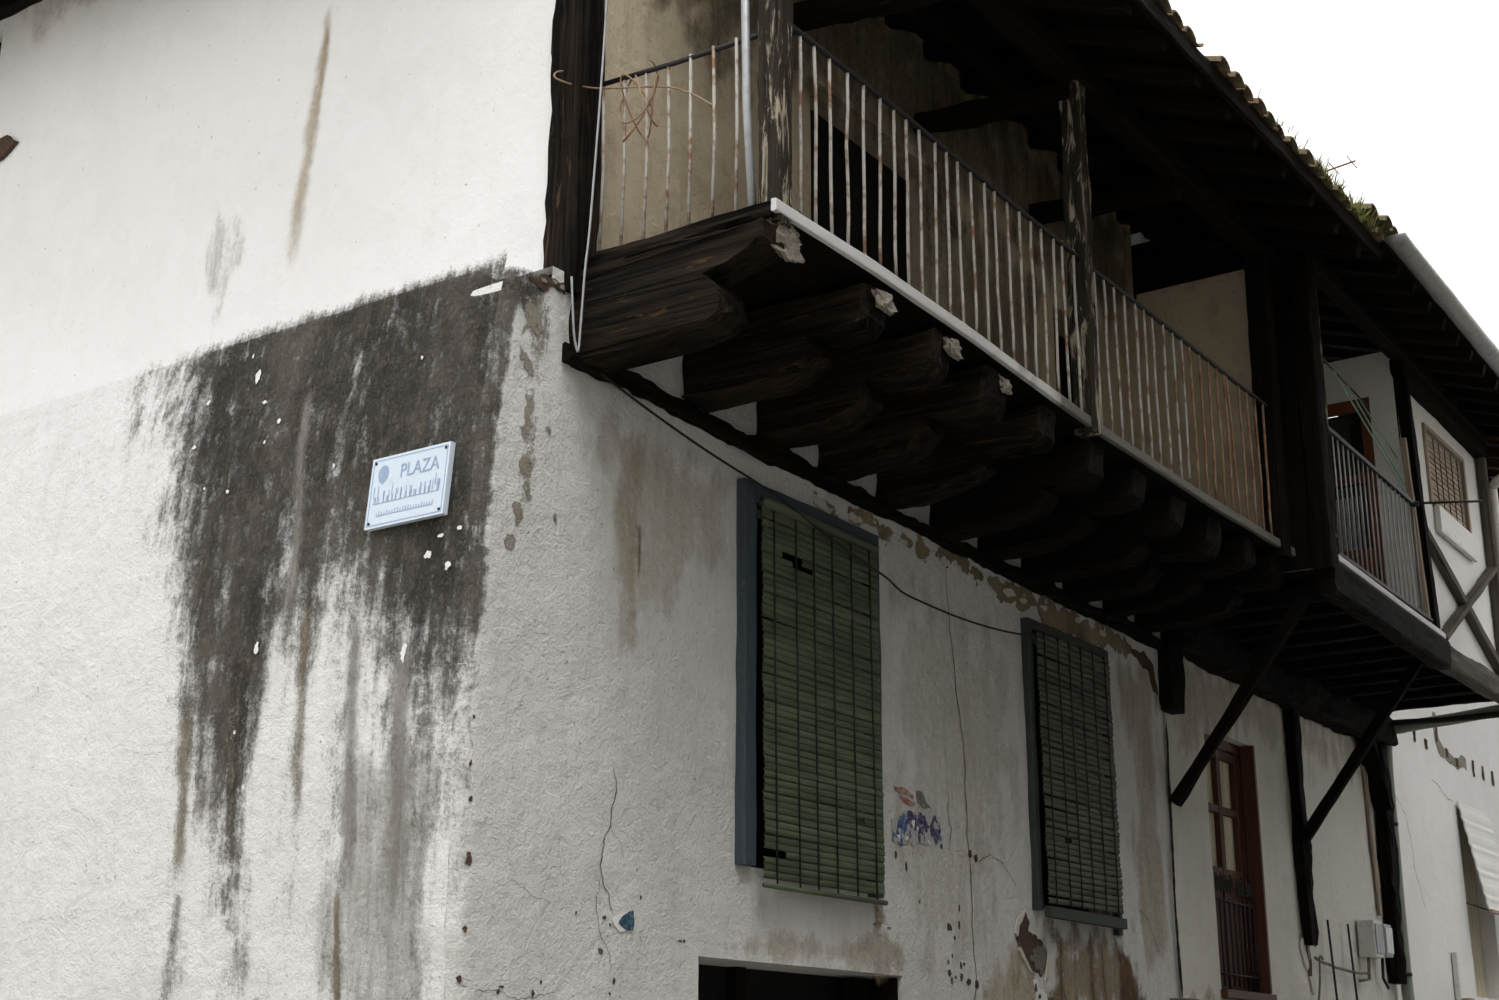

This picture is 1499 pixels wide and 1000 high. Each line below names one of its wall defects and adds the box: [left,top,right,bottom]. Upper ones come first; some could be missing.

leakage [129,255,542,1000]
flaking render [812,492,1158,696]
crack [596,765,624,974]
crack [945,566,1015,1000]
flaking render [1014,908,1055,1000]